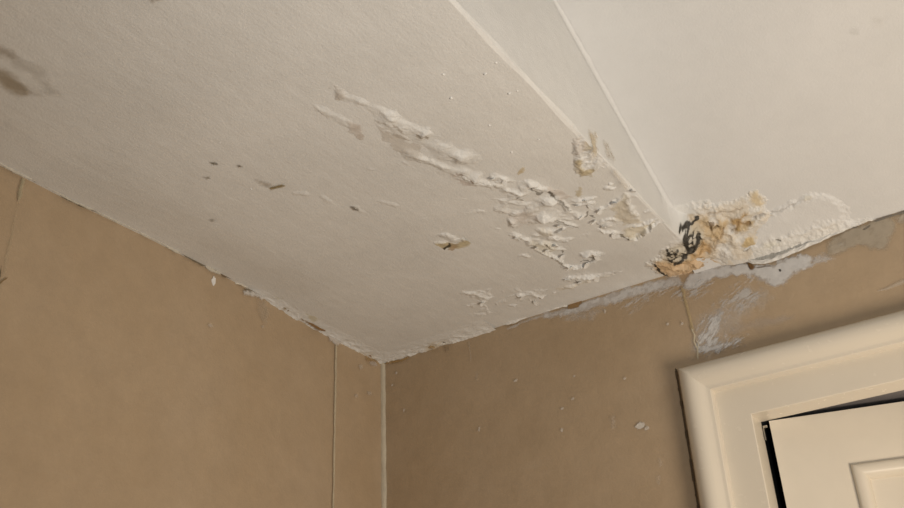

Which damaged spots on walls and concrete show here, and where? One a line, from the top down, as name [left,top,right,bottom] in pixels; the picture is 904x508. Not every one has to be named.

peeling [312,84,493,188]
spalling [434,232,472,251]
mould [666,216,702,266]
spalling [644,187,904,277]